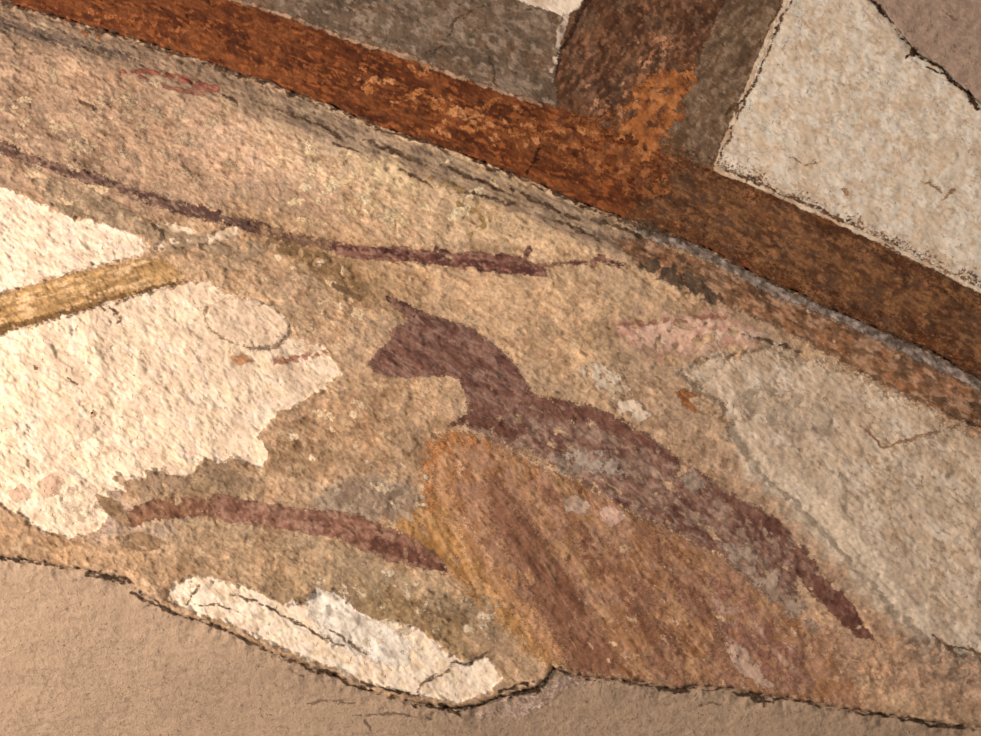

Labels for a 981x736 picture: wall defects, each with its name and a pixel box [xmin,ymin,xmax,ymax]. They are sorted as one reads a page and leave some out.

peeling [0,96,33,111]
peeling [24,162,49,184]
peeling [48,119,142,172]
peeling [0,183,240,293]
peeling [273,254,298,281]
peeling [0,266,367,540]
peeling [369,462,408,529]
peeling [553,448,628,479]
peeling [674,340,981,662]
peeling [168,568,503,704]
crack [0,555,981,731]
peeling [724,642,774,688]